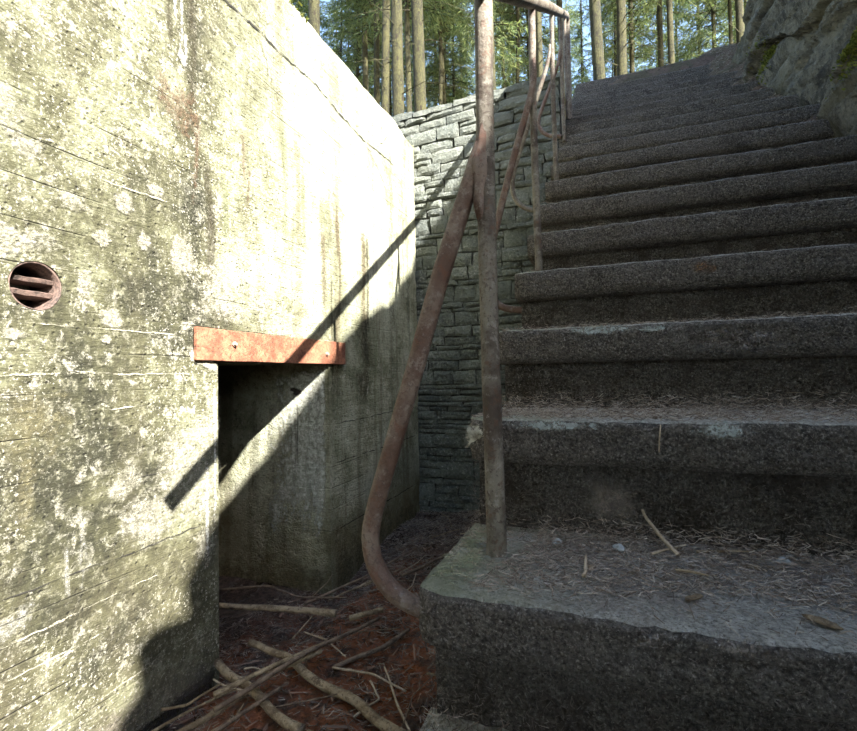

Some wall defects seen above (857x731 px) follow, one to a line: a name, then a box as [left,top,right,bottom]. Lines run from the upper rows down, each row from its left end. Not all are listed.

damp [167,0,196,114]
crack [225,0,393,190]
damp [204,166,216,275]
damp [362,239,374,330]